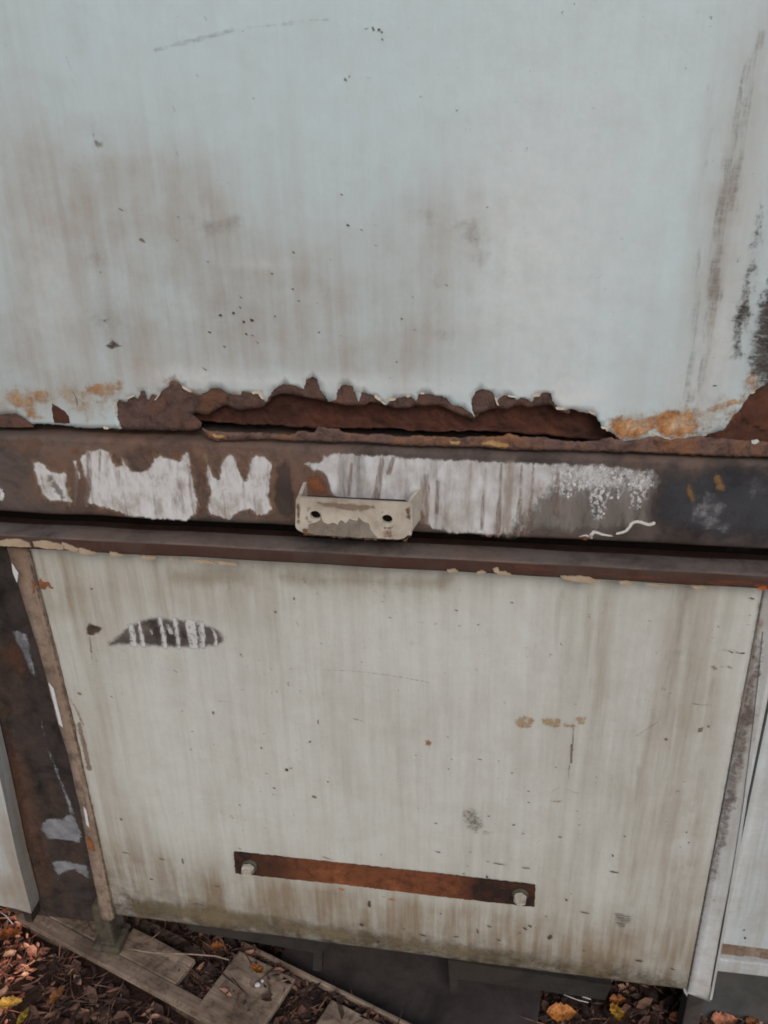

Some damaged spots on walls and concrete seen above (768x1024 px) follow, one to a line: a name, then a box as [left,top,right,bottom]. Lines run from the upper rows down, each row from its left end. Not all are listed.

leakage [734,267,768,389]
rust [0,390,70,428]
rust [87,369,768,499]
peeling [32,448,275,521]
rust [275,463,391,541]
rust [406,479,438,525]
peeling [305,453,654,538]
rust [481,464,534,537]
rust [32,579,53,593]
rust [517,716,586,728]